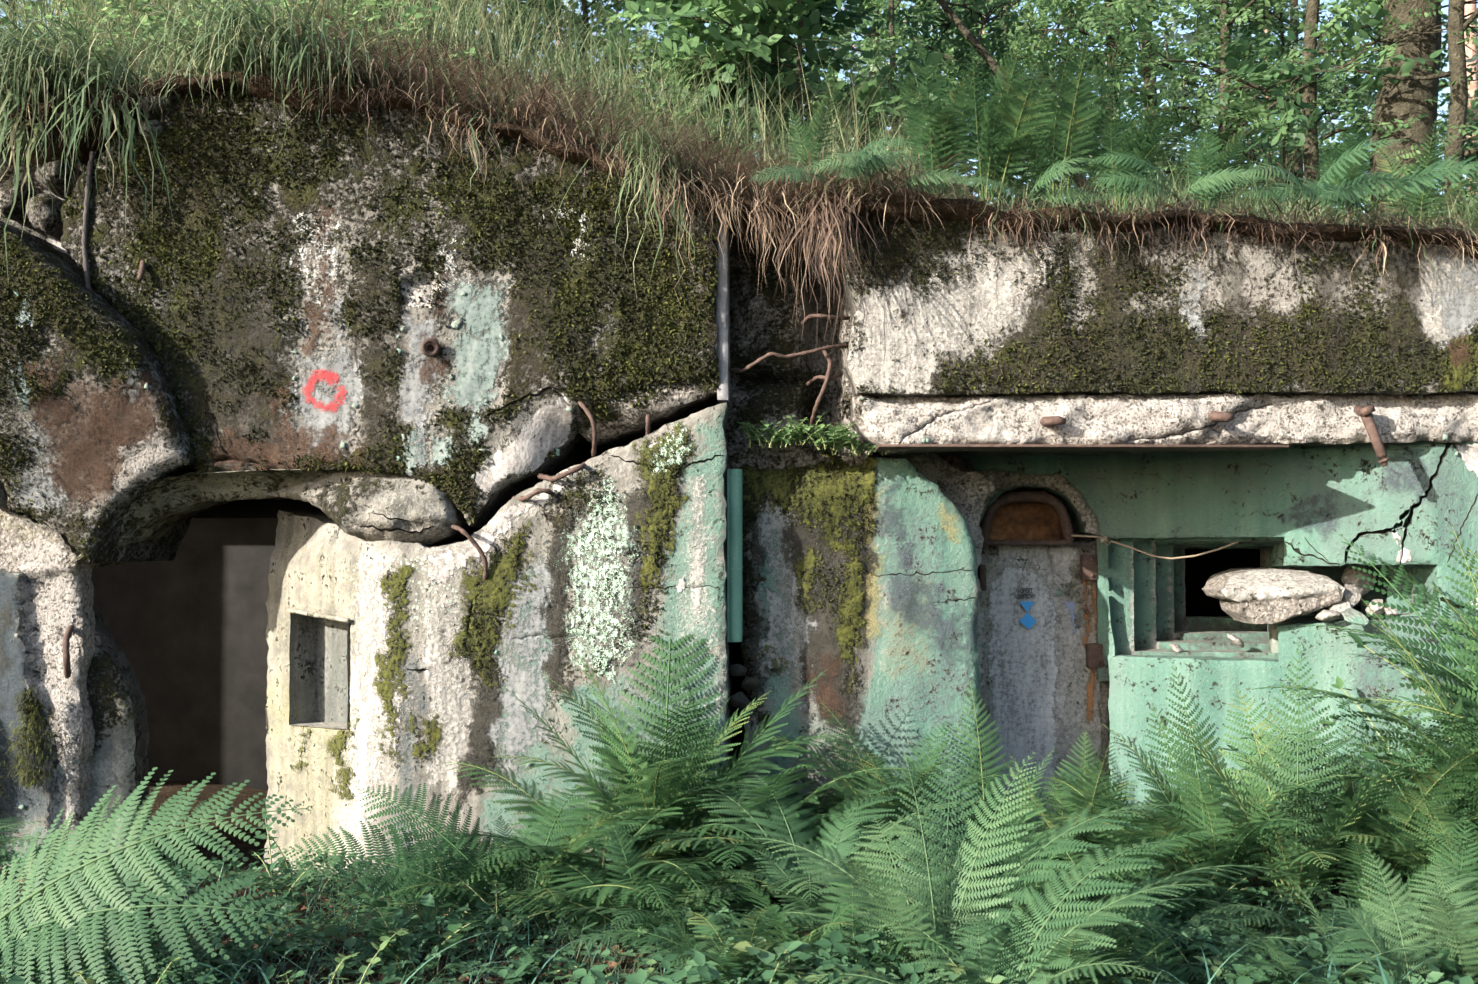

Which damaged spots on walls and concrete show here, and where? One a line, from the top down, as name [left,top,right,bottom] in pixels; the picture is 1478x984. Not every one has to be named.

corrosion [419,334,448,385]
crack [488,386,625,430]
crack [612,455,723,472]
crack [1285,446,1450,565]
damp [743,502,879,747]
spalling [850,393,1478,831]
corrosion [1086,669,1095,721]